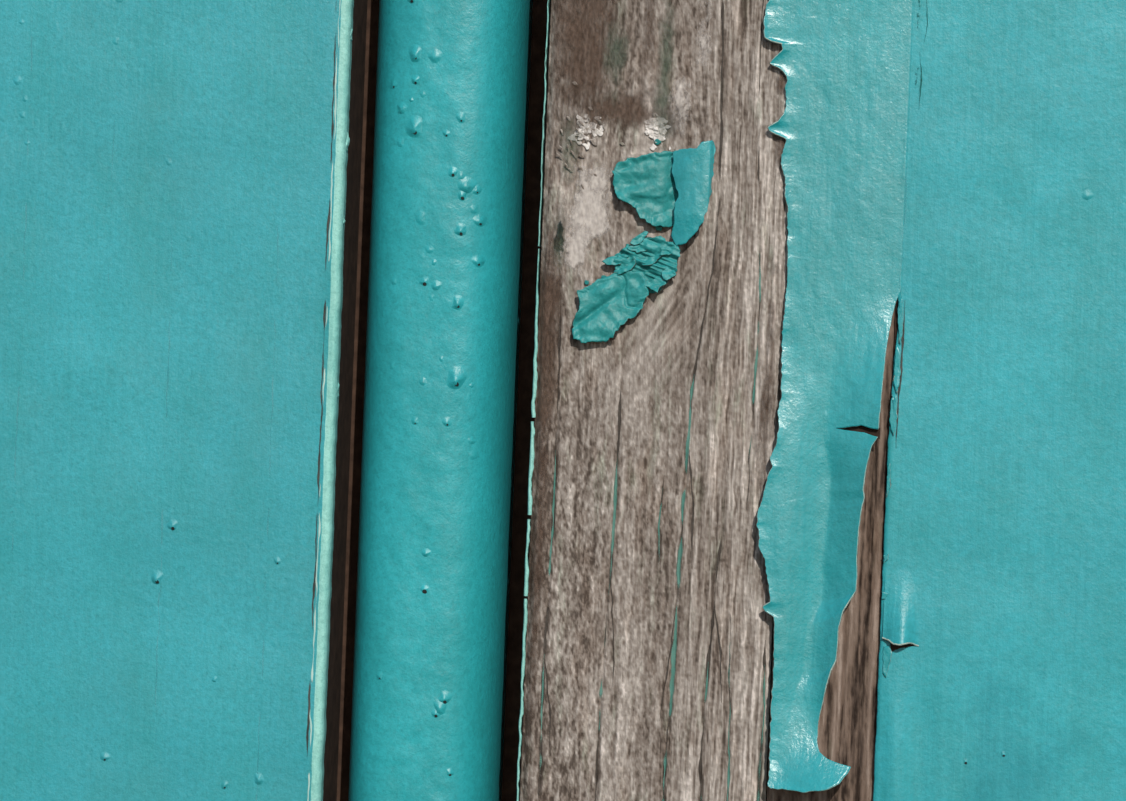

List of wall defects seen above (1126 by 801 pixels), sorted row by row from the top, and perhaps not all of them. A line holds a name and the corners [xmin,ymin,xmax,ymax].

peeling [568,114,716,343]
peeling [756,0,913,793]